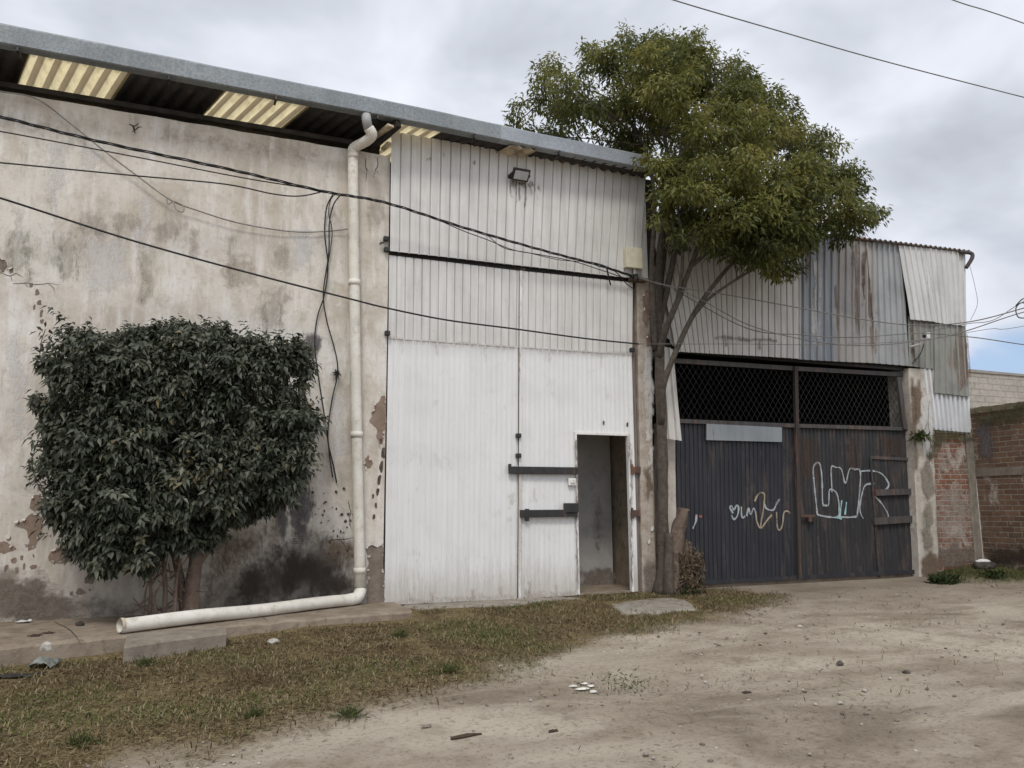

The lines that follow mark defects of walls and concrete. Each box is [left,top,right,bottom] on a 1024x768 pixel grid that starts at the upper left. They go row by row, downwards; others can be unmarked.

corrosion [862,247,873,319]
peeling [363,396,387,519]
peeling [0,493,71,573]
water stain [206,393,354,606]
spalling [366,544,385,603]